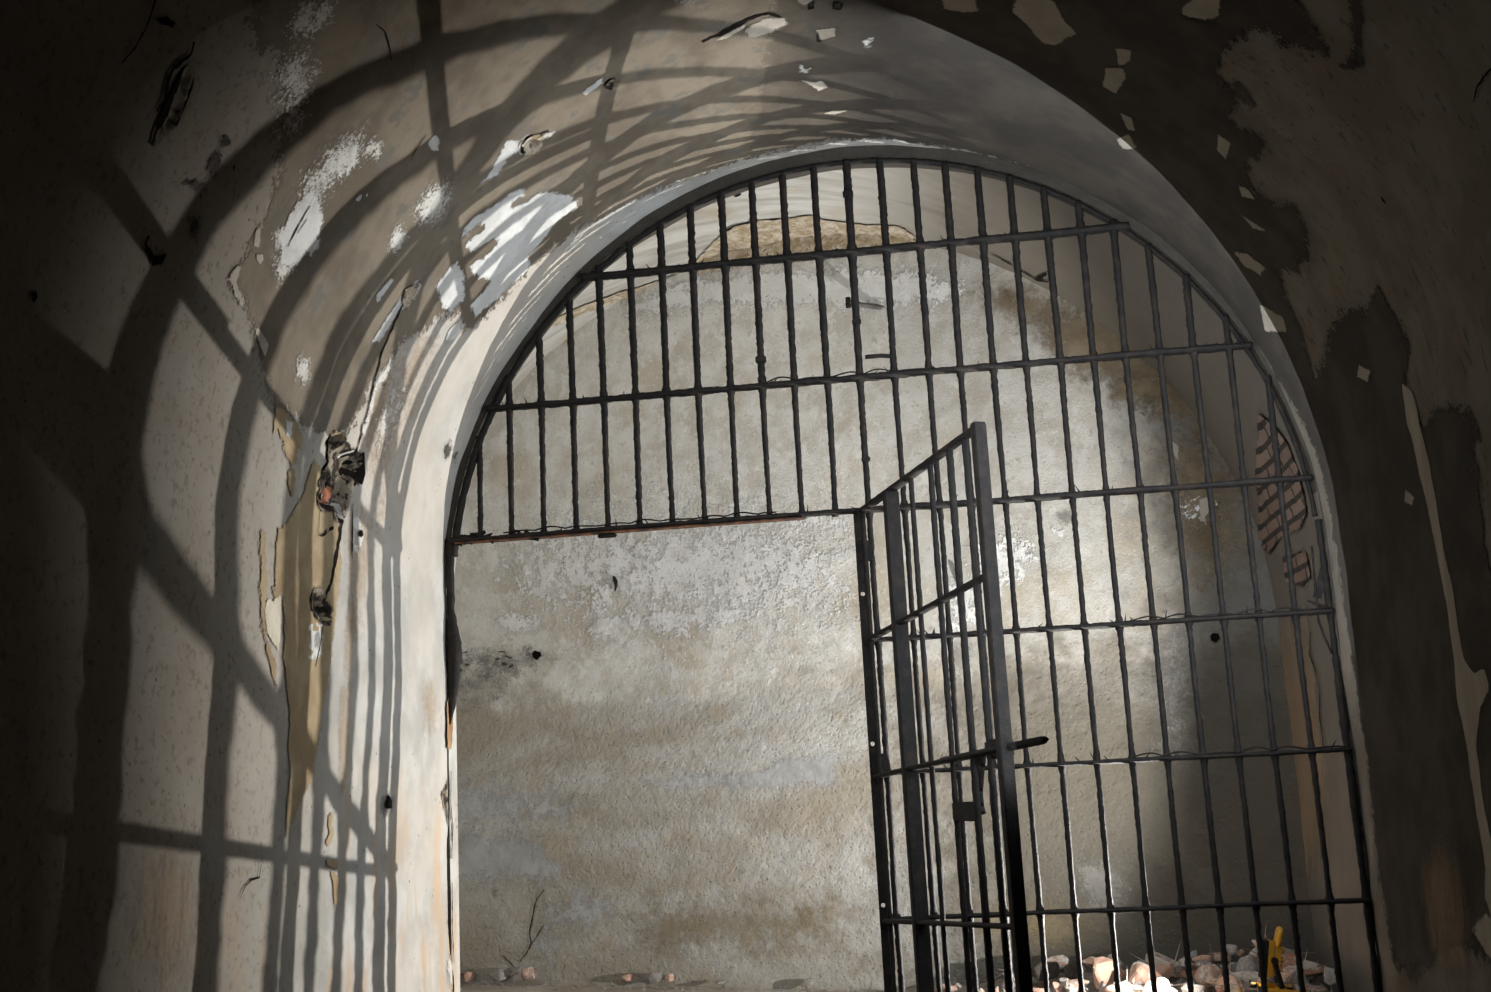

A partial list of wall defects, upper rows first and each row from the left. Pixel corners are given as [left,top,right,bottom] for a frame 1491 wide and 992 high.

peeling [1182,0,1221,20]
peeling [1102,67,1127,94]
peeling [1117,134,1137,149]
flaking render [696,215,916,275]
flaking render [549,274,677,329]
peeling [1260,305,1287,333]
flaking render [1255,414,1311,587]
flaking render [1419,398,1491,838]
flaking render [258,459,342,836]
flaking render [457,650,542,703]
flaking render [382,794,394,815]
flaking render [441,779,449,824]